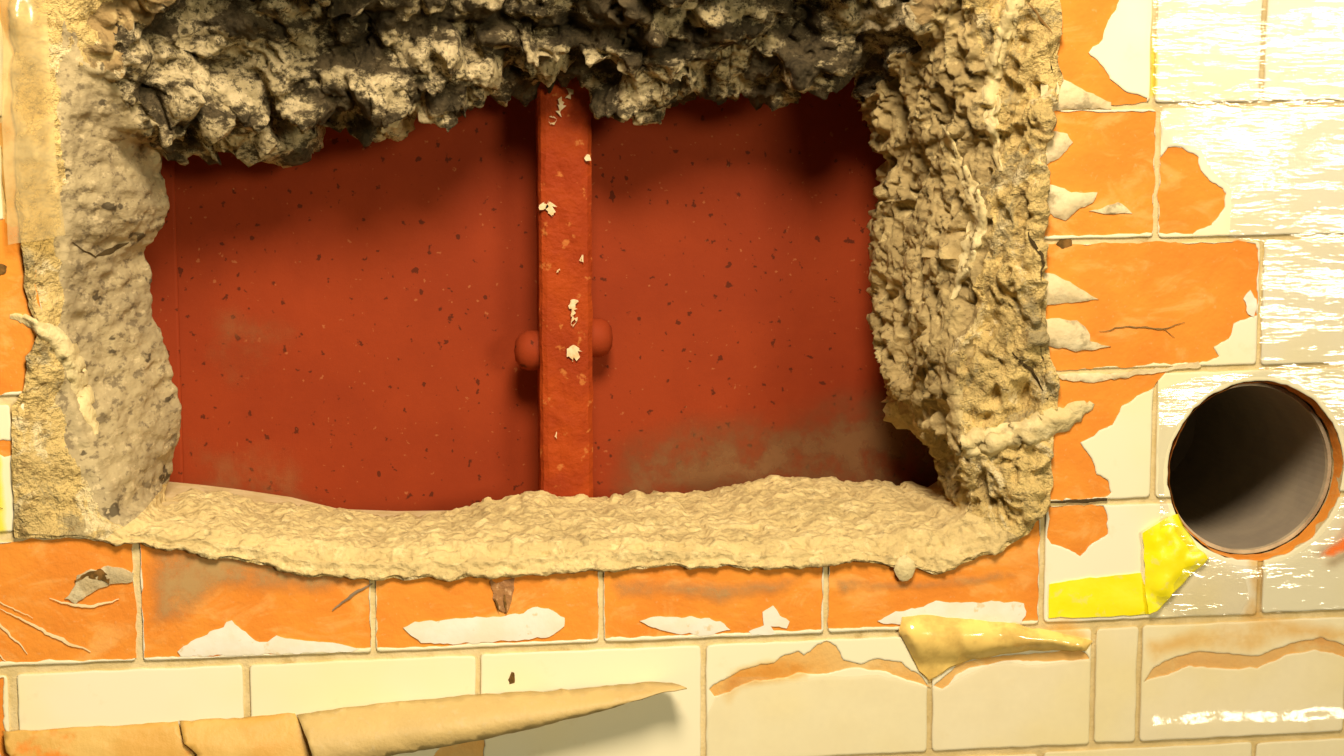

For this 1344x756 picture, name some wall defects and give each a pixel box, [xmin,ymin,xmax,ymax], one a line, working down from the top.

spalling [1157,147,1226,234]
spalling [0,0,1201,662]
crack [1099,322,1185,338]
spalling [1045,238,1259,371]
spalling [709,641,1089,696]
spalling [0,677,9,756]